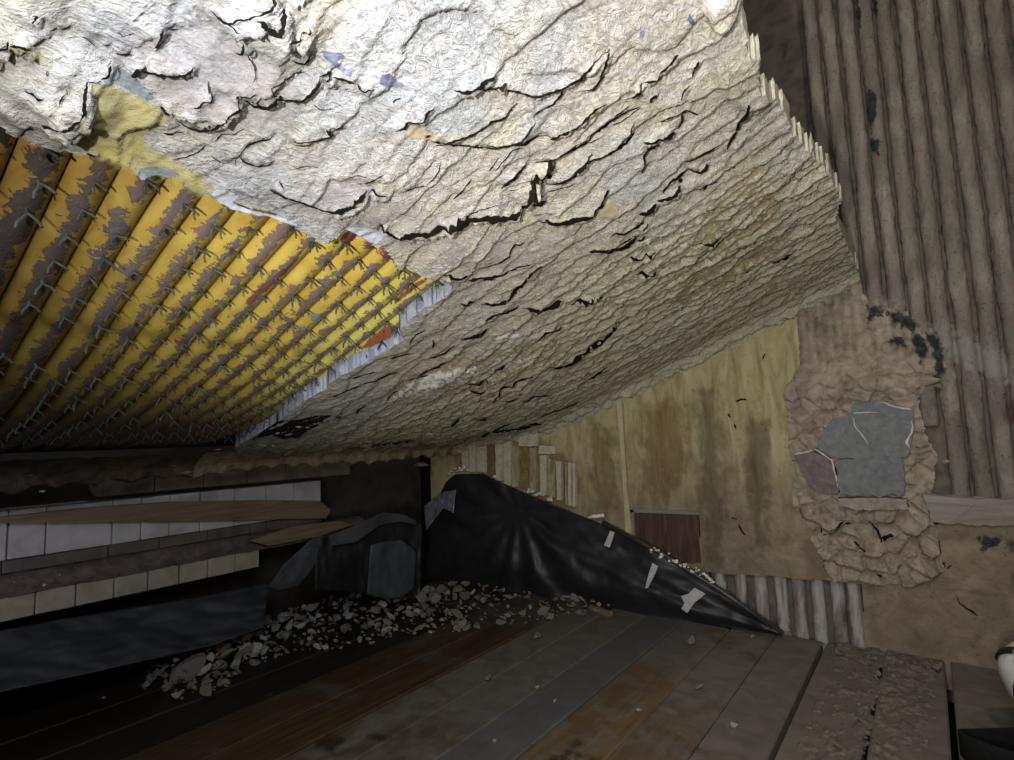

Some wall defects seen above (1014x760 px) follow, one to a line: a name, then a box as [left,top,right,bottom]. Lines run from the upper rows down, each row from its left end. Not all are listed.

crack [0,41,31,52]
spalling [103,67,154,101]
spalling [322,51,352,76]
spalling [120,160,193,191]
spalling [211,189,316,240]
crack [23,0,699,419]
crack [589,105,750,279]
spalling [346,227,395,263]
spalling [736,0,950,587]
spalling [235,282,454,454]
crack [348,322,620,450]